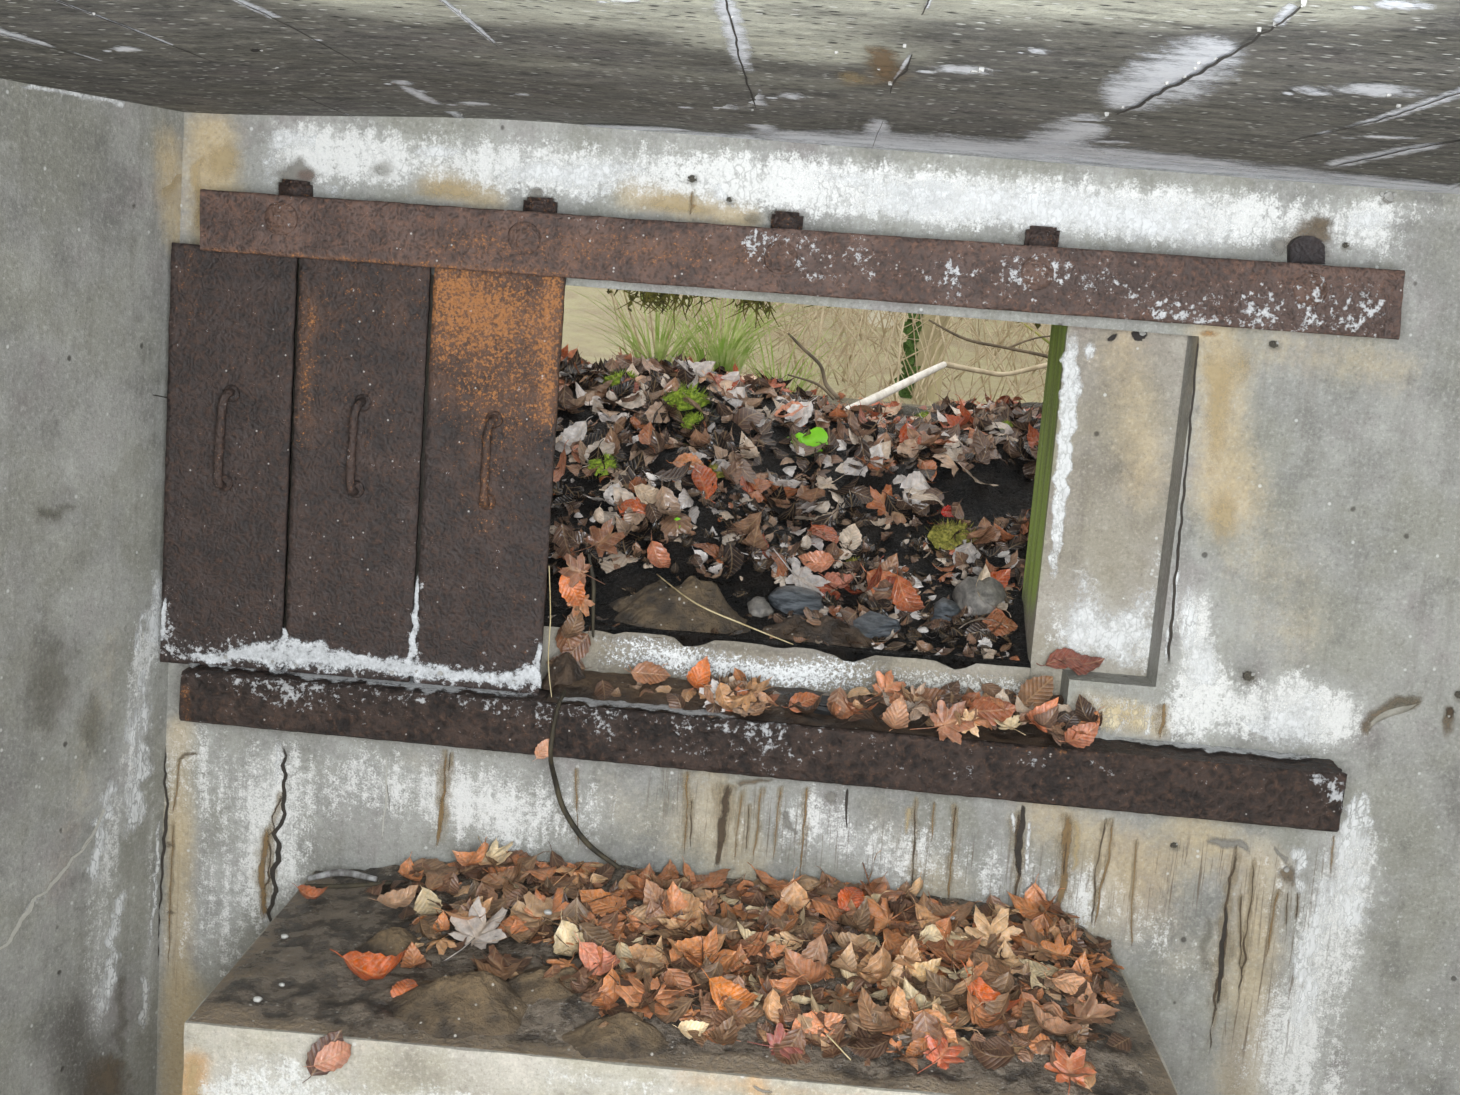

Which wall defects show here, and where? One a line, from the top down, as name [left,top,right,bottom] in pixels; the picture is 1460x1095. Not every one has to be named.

crack [1165,343,1199,661]
water stain [135,579,167,651]
water stain [189,579,542,697]
water stain [559,697,733,718]
water stain [87,668,160,945]
crack [258,744,288,922]
water stain [783,788,848,876]
water stain [1011,806,1031,896]
water stain [97,891,124,1011]
water stain [138,978,150,1025]